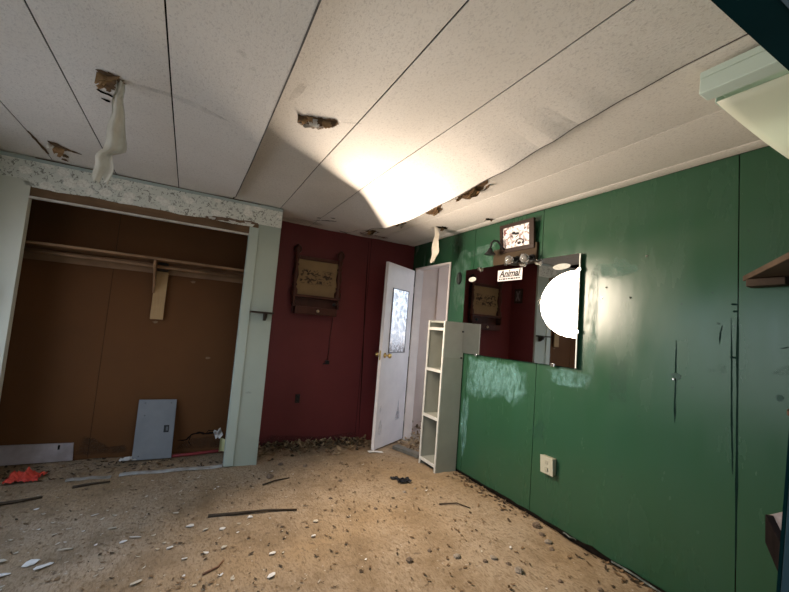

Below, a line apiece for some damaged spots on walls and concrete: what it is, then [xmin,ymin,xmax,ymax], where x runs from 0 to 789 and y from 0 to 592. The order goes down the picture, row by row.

peeling [94,72,120,89]
peeling [297,114,337,129]
peeling [454,184,490,202]